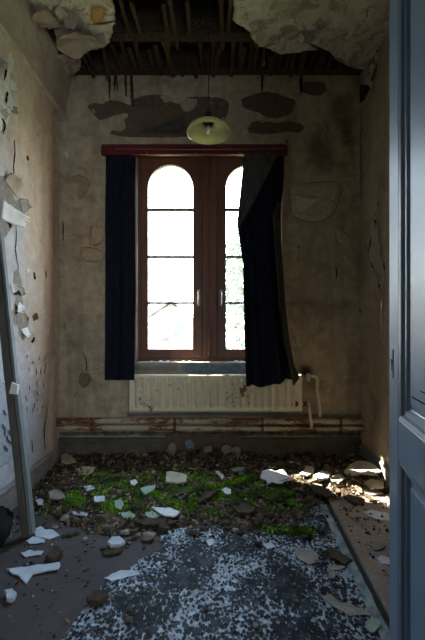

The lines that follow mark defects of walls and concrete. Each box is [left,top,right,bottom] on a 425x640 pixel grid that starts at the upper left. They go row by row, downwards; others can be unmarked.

peeling [32,5,107,59]
peeling [0,51,19,135]
peeling [88,95,229,138]
peeling [241,92,304,134]
peeling [0,172,32,237]
peeling [10,268,39,343]